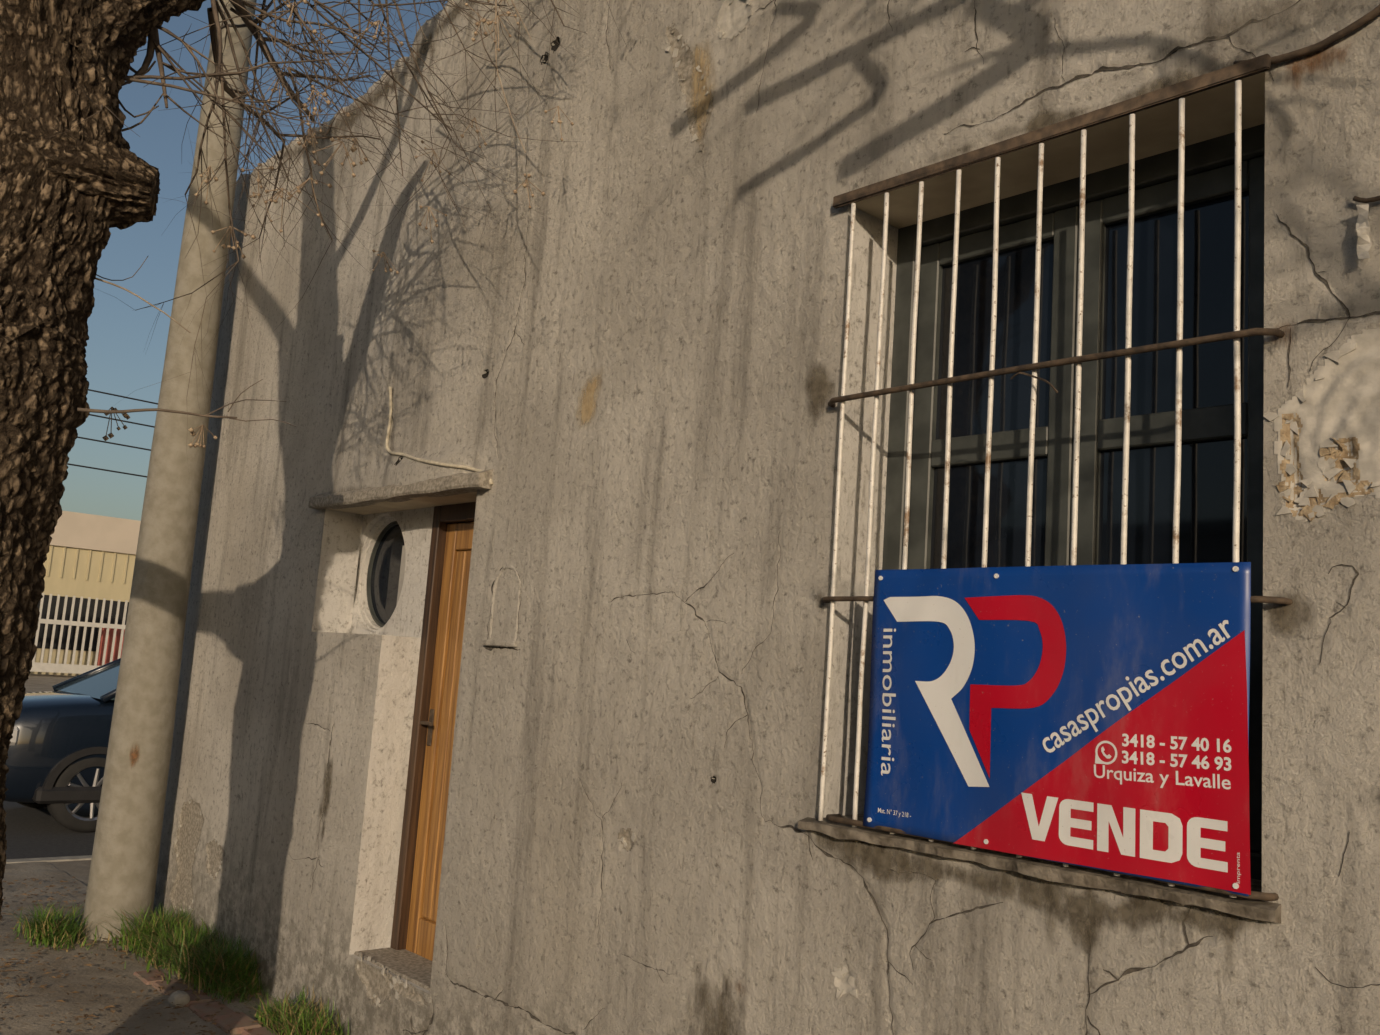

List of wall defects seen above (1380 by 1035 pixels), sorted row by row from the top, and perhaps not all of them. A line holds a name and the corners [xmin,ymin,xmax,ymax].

spalling [665,26,714,151]
spalling [717,0,752,40]
crack [946,0,1300,134]
crack [1276,214,1380,384]
peeling [1264,328,1380,522]
crack [1319,564,1359,664]
crack [611,532,1003,1032]
spalling [170,799,225,912]
crack [580,779,667,983]
crack [403,926,603,1035]
spalling [831,964,858,998]
crack [1085,906,1213,1035]